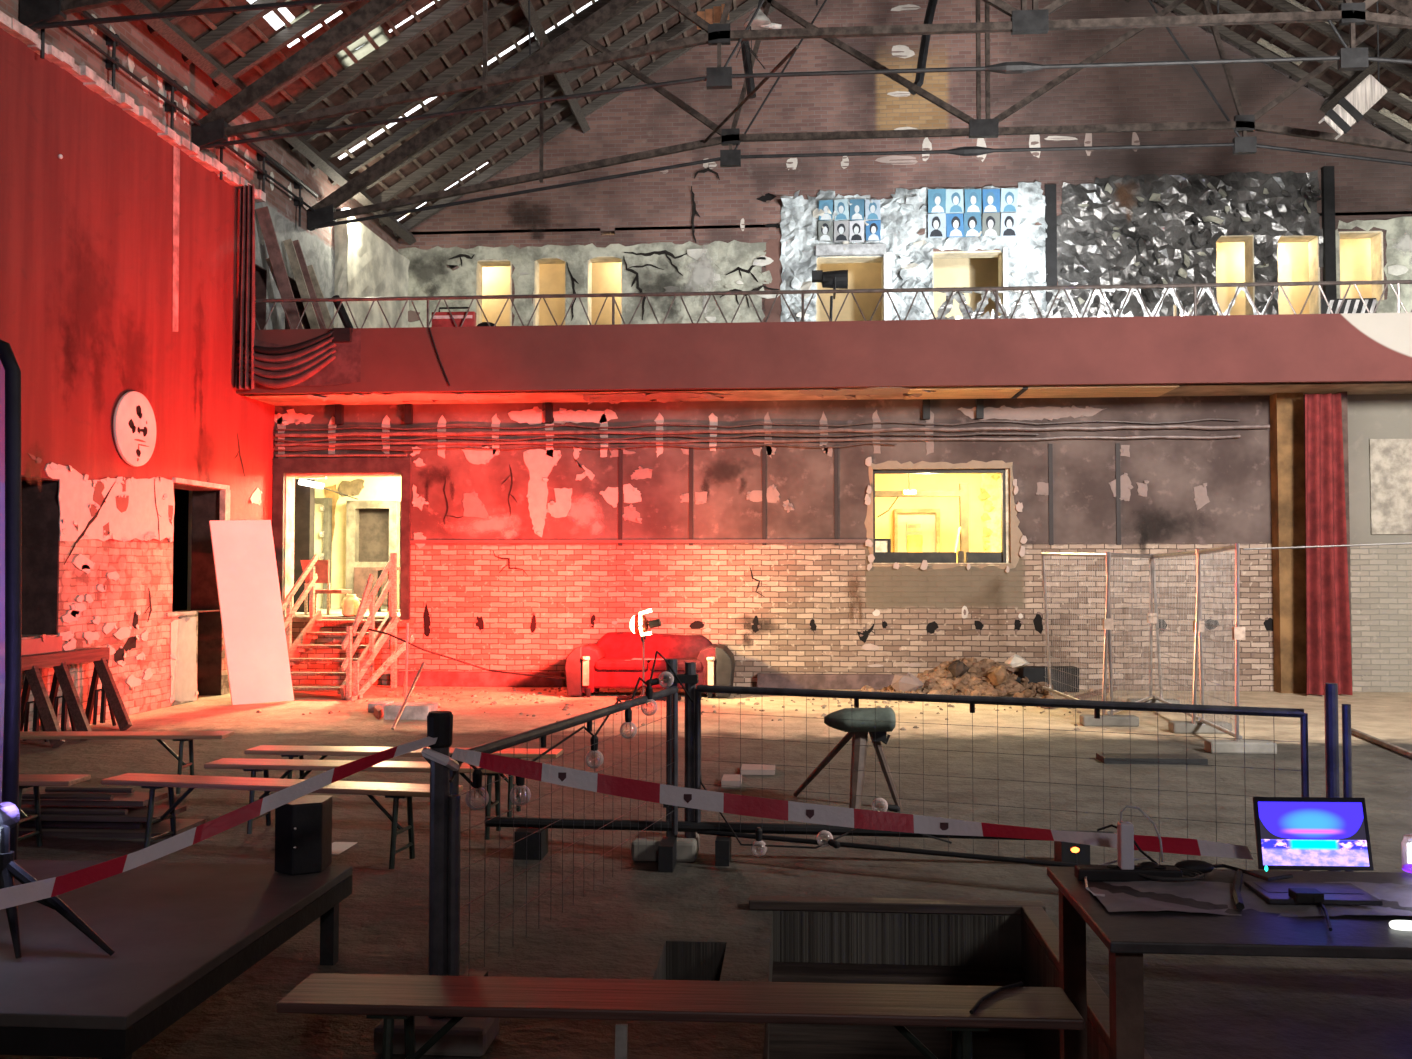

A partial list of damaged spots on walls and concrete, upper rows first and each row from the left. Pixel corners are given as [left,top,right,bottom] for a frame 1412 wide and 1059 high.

crack [624,166,720,320]
crack [720,265,779,307]
peeling [410,446,425,467]
peeling [462,446,497,465]
crack [64,481,116,565]
peeling [28,453,175,543]
peeling [412,485,429,511]
peeling [523,447,652,537]
peeling [680,491,707,504]
peeling [746,484,794,512]
flaking render [864,457,1049,573]
spalling [114,610,146,676]